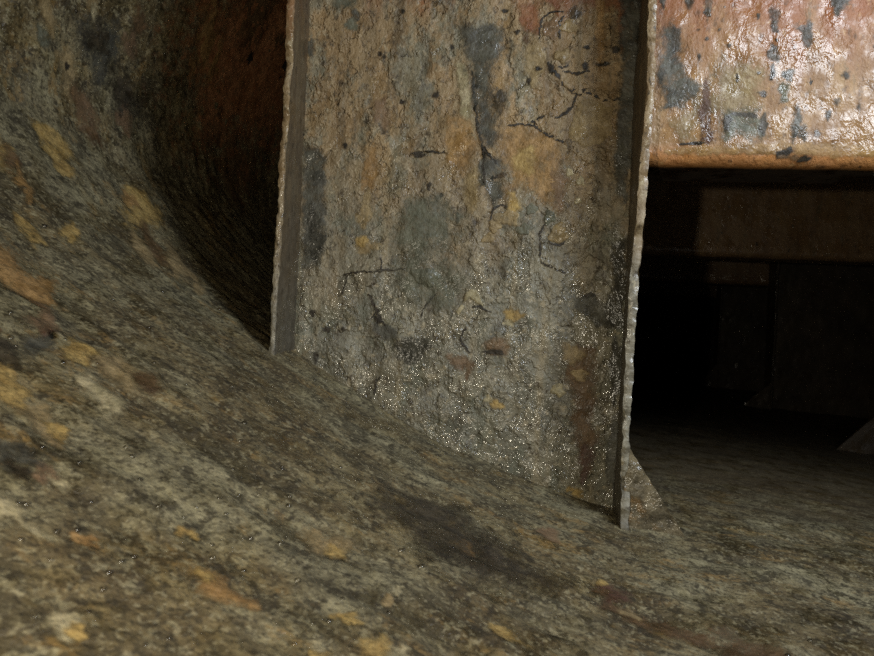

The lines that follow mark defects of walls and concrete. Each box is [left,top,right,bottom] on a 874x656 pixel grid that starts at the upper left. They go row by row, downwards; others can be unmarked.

water stain [461,24,506,148]
crack [508,60,622,143]
water stain [478,157,503,207]
water stain [373,322,430,364]
water stain [604,238,627,404]
rust [564,342,599,498]